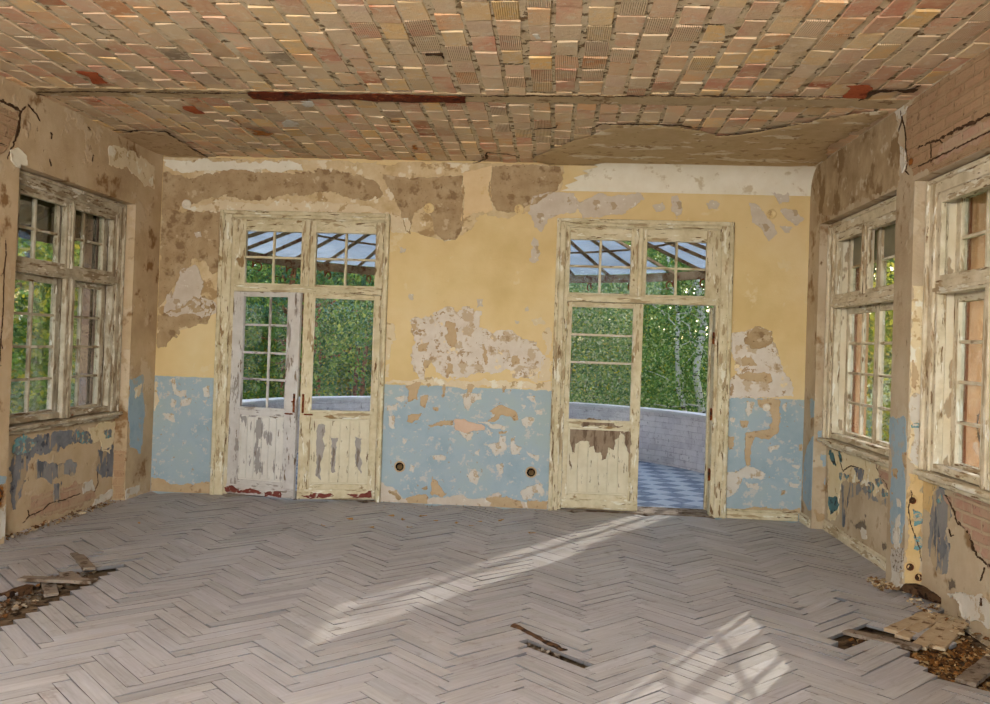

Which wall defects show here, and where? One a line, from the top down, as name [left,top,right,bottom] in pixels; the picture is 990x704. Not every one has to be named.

crack [0,91,247,166]
crack [464,85,990,175]
peeling [156,157,682,348]
peeling [315,424,338,480]
peeling [354,437,362,473]
peeling [347,477,548,509]
peeling [385,299,552,474]
peeling [726,326,794,497]
peeling [745,285,990,584]
crack [945,495,990,581]